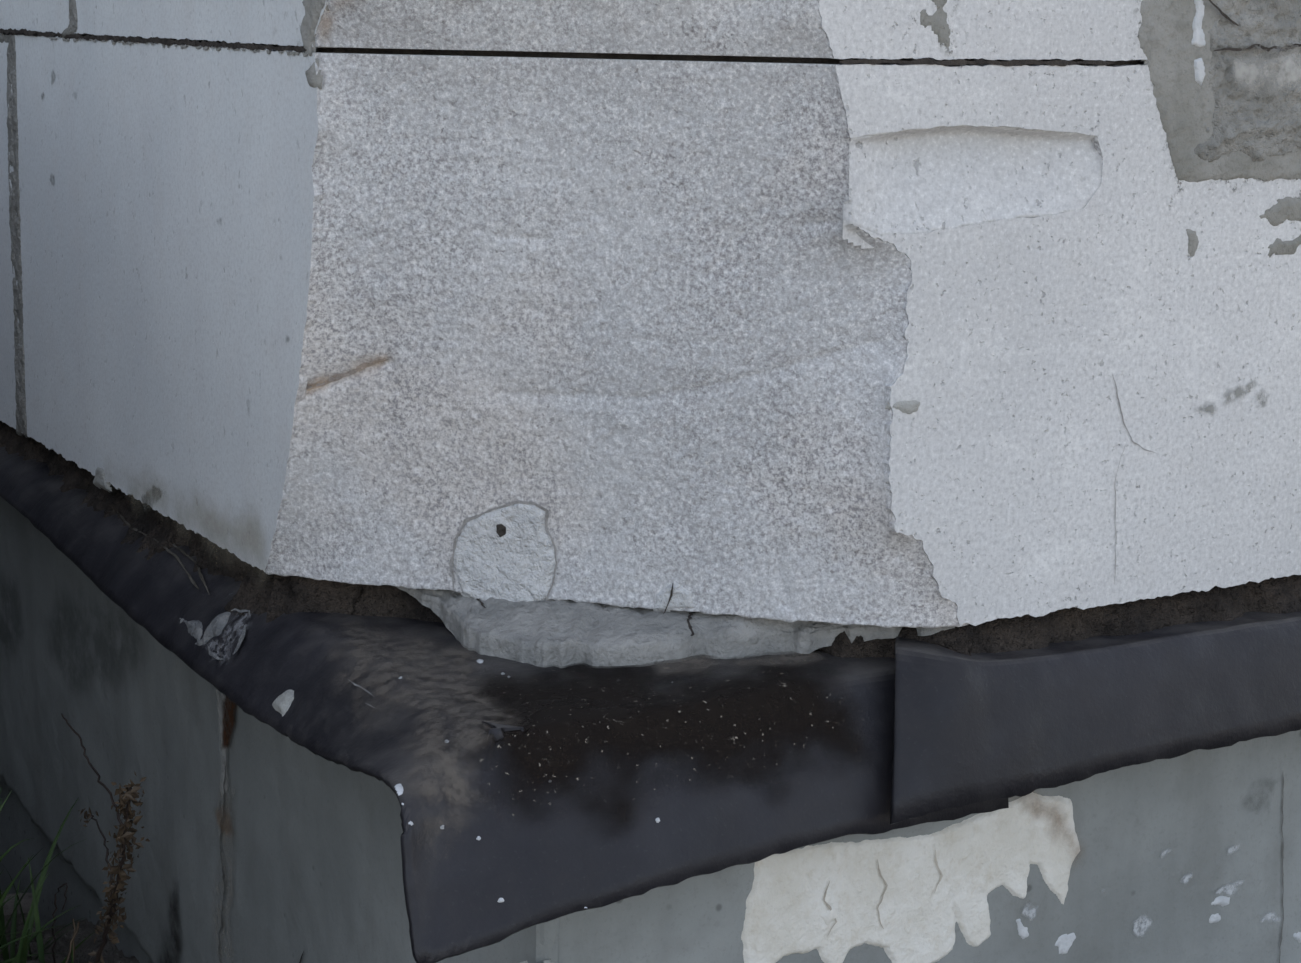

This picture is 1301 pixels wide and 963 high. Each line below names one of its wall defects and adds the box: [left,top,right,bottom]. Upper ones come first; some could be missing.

crack [0,28,310,57]
crack [839,58,1114,66]
spalling [265,0,968,628]
rust [223,696,236,747]
crack [219,755,227,963]
peeling [741,792,1080,963]
crack [1277,777,1285,963]